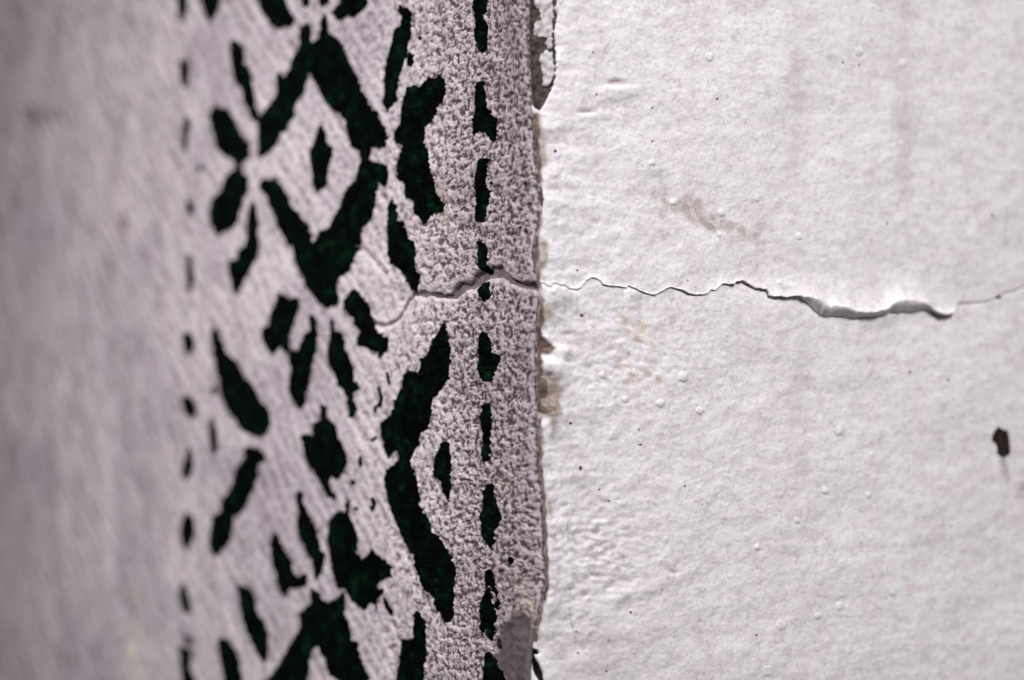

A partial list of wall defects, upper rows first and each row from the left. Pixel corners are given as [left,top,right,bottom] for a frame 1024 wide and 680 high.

spalling [529,0,557,111]
crack [373,266,1024,326]
spalling [537,332,555,354]
spalling [537,378,550,413]
hole [992,427,1010,466]